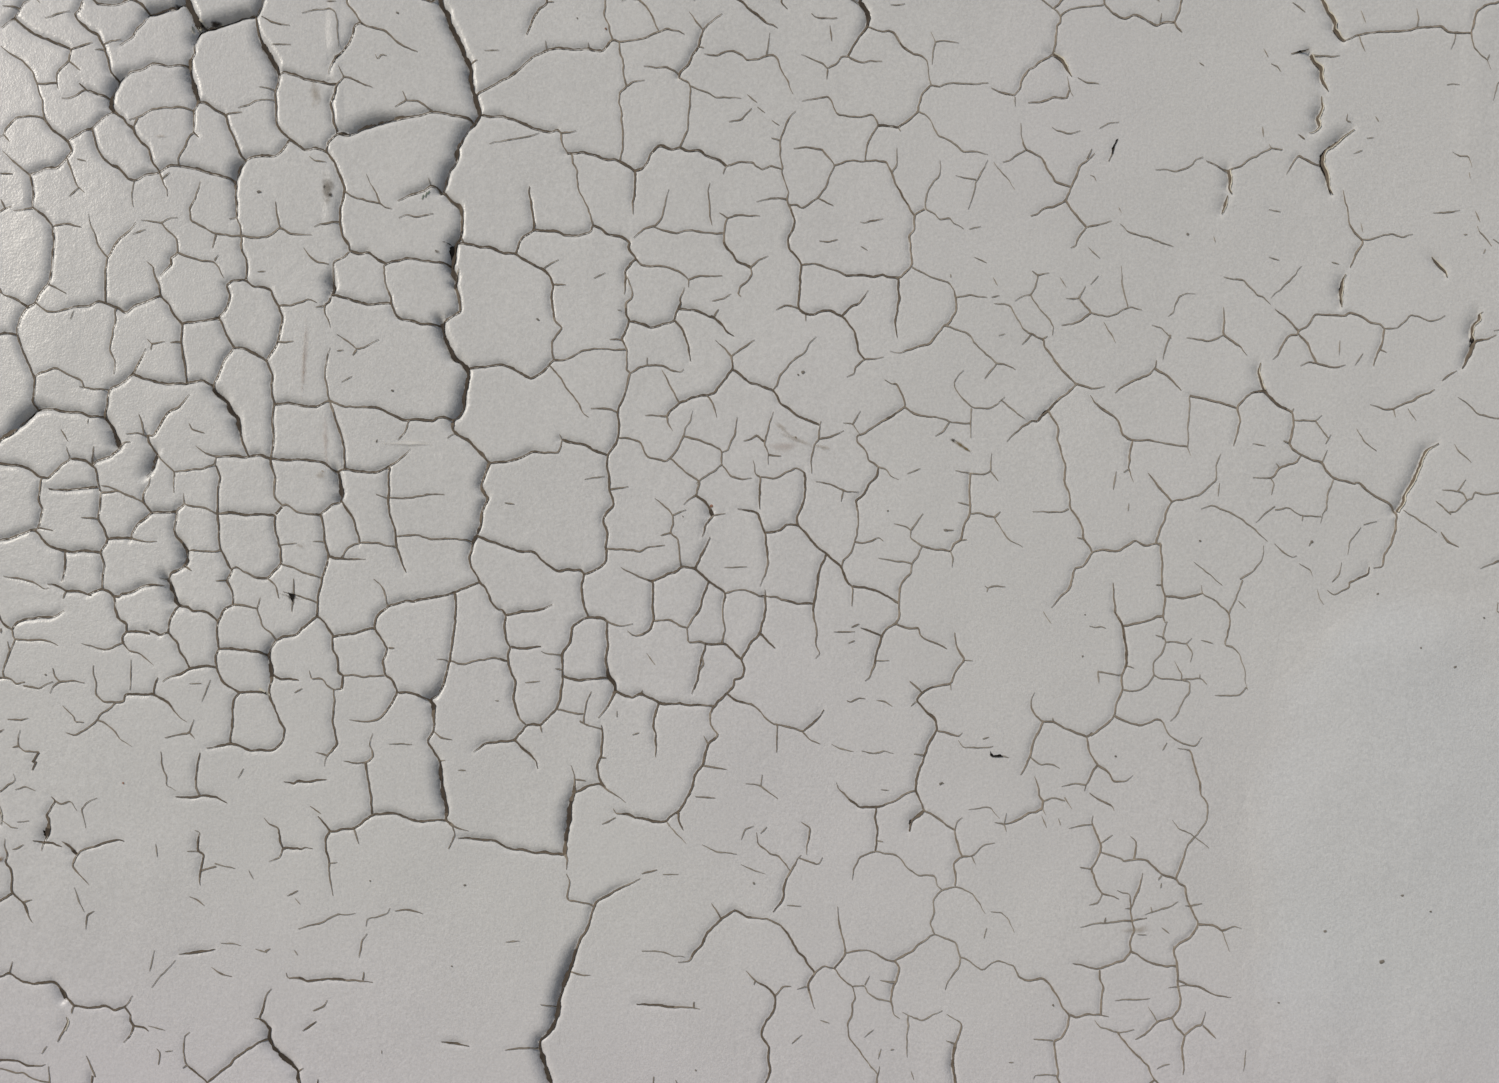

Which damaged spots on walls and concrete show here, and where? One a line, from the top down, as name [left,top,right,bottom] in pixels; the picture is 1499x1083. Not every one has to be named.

crack [1345,1,1499,85]
crack [1004,135,1110,248]
crack [1155,127,1282,242]
crack [1223,191,1445,368]
crack [1370,312,1499,420]
crack [1090,362,1459,595]
crack [682,303,1267,1083]
crack [0,718,123,928]
crack [0,961,318,1083]
crack [286,908,423,982]
crack [507,874,639,1083]
crack [636,1001,699,1009]